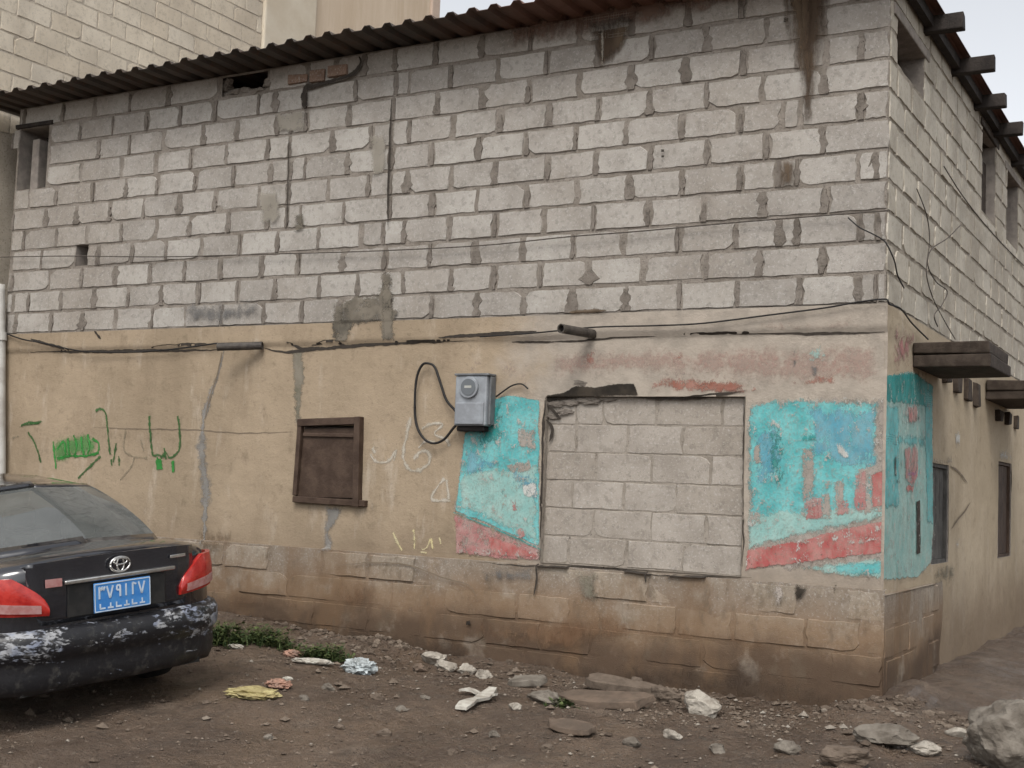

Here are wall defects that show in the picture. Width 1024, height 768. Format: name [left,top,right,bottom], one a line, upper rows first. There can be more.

water stain [784,0,827,107]
spalling [545,380,638,420]